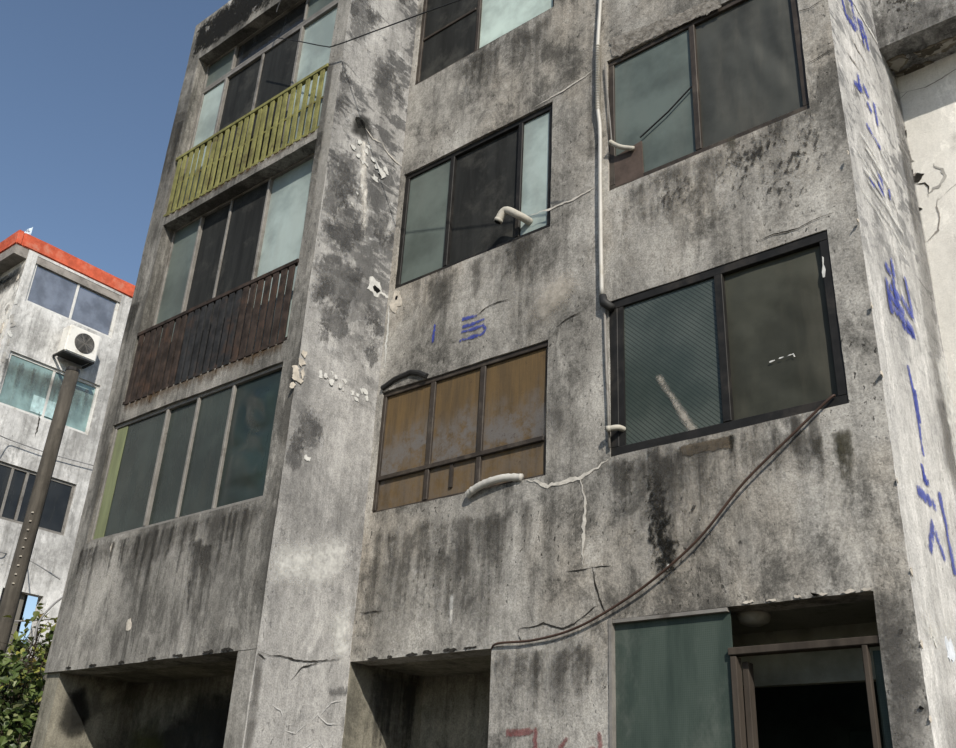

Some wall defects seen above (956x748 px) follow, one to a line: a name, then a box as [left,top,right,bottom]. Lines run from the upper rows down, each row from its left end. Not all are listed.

spalling [346,139,389,207]
crack [917,163,956,242]
peeling [367,276,402,313]
leakage [381,292,389,367]
spalling [290,350,307,388]
spalling [319,370,368,402]
leakage [643,447,680,575]
crack [518,459,608,640]
crack [258,652,339,681]